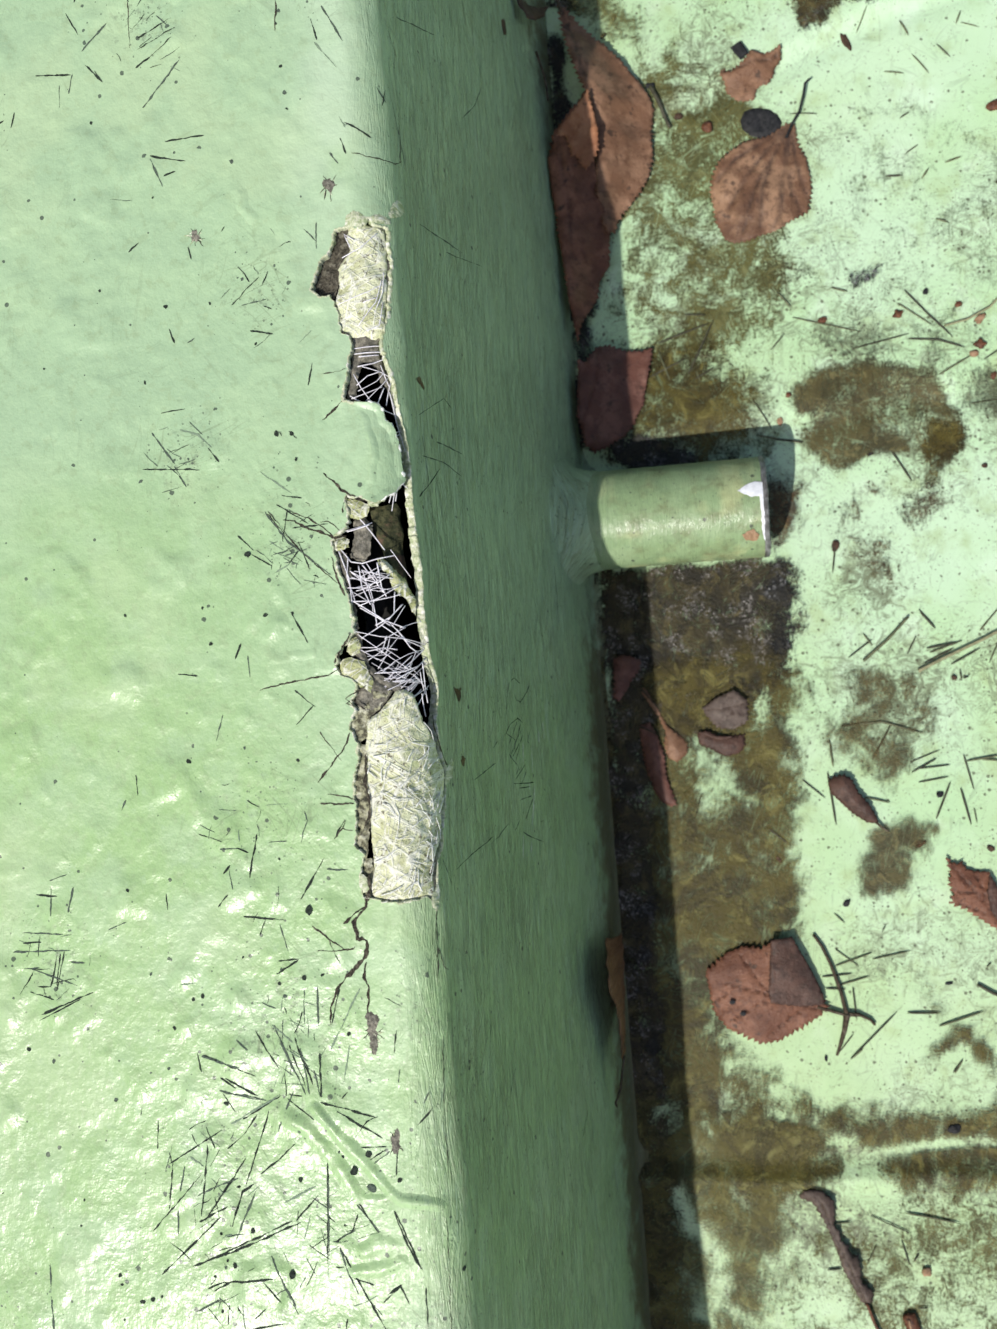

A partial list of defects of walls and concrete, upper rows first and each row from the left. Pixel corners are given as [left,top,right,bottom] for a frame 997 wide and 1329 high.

spalling [309,200,454,911]
leakage [760,544,798,657]
crack [312,874,371,1025]